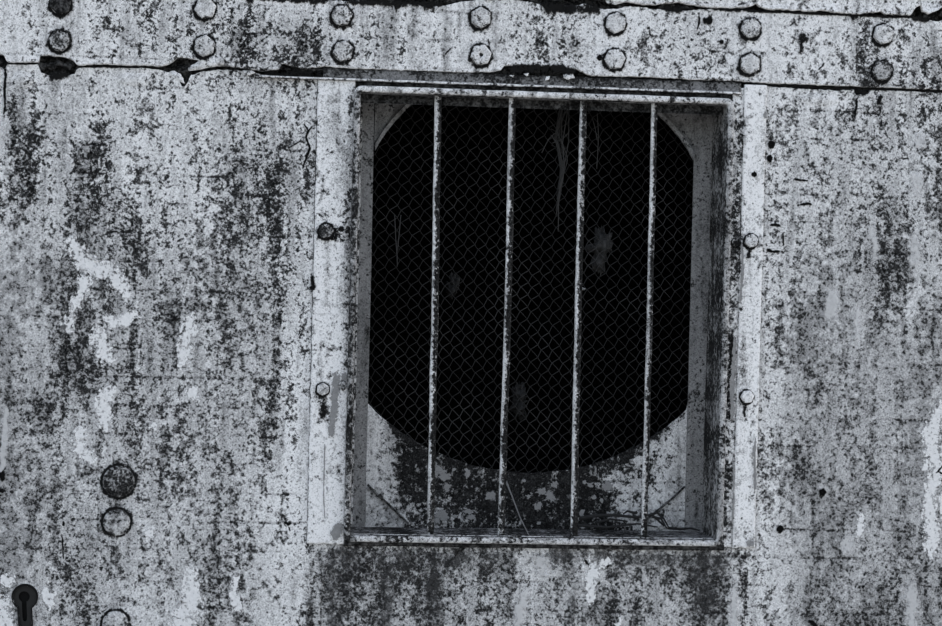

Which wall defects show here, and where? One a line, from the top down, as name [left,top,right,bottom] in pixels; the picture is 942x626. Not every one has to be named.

crack [246,0,492,12]
crack [526,0,627,16]
crack [657,3,942,30]
crack [0,56,323,115]
water stain [51,142,143,380]
water stain [165,296,199,371]
water stain [71,384,120,464]
water stain [920,399,942,560]
water stain [167,564,205,626]
water stain [228,571,243,613]
water stain [305,545,509,626]
water stain [535,548,739,626]